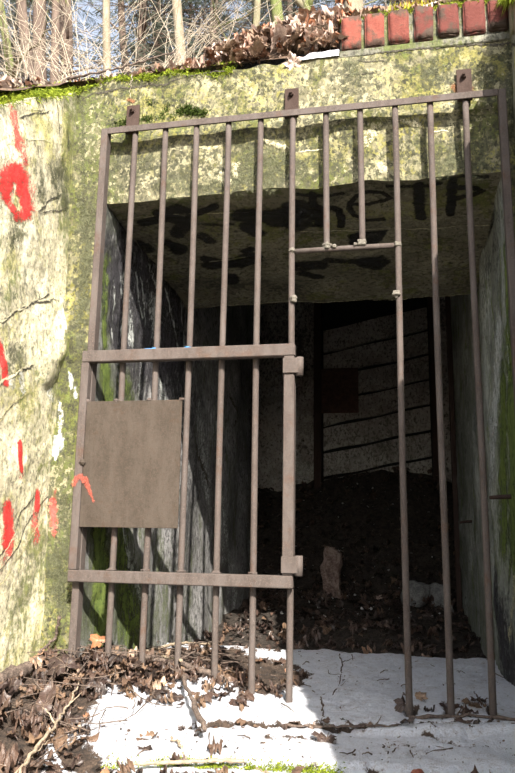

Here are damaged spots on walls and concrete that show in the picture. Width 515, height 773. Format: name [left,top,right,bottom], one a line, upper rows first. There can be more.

leakage [157,146,308,199]
leakage [422,148,487,181]
crack [38,192,66,214]
crack [0,293,57,323]
leakage [489,242,515,589]
leakage [90,527,137,571]
leakage [88,583,141,649]